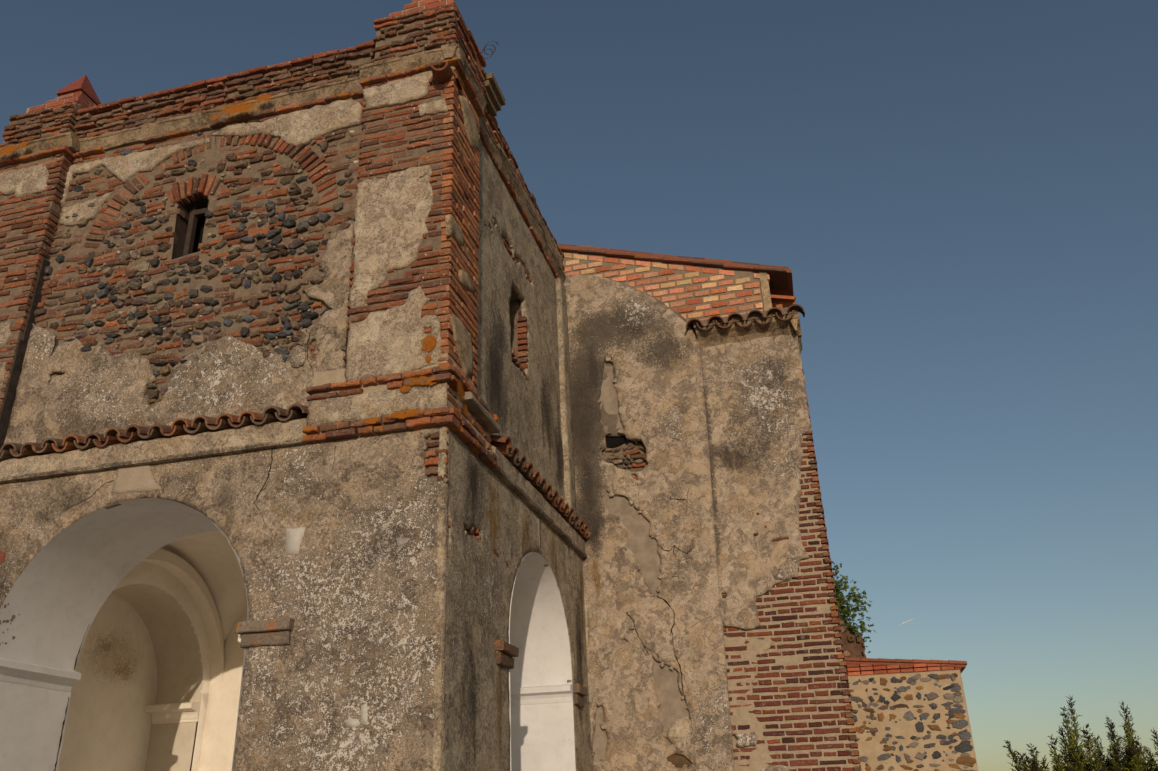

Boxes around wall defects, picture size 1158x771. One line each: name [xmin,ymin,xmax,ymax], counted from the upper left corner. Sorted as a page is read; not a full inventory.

spalling [0,71,480,444]
crack [254,448,275,528]
peeling [597,400,665,597]
crack [626,545,711,701]
spalling [723,369,861,771]
peeling [665,754,692,771]